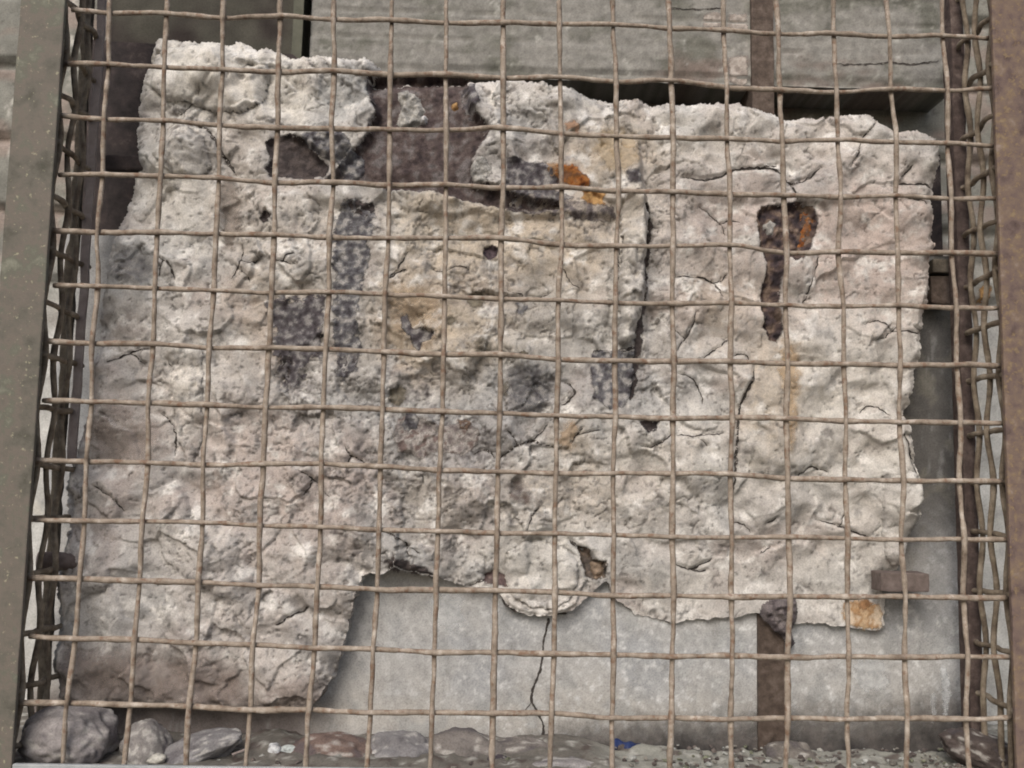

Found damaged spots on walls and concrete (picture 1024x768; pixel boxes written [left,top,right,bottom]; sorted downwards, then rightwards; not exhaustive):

spalling [264,76,616,222]
corrosion [547,163,606,205]
crack [684,165,822,208]
crack [899,165,931,204]
spalling [264,198,376,392]
crack [593,202,653,400]
crack [679,275,726,296]
spalling [757,201,818,343]
spalling [640,420,660,433]
spalling [578,546,607,580]
corrosion [842,599,883,630]
crack [469,579,567,735]